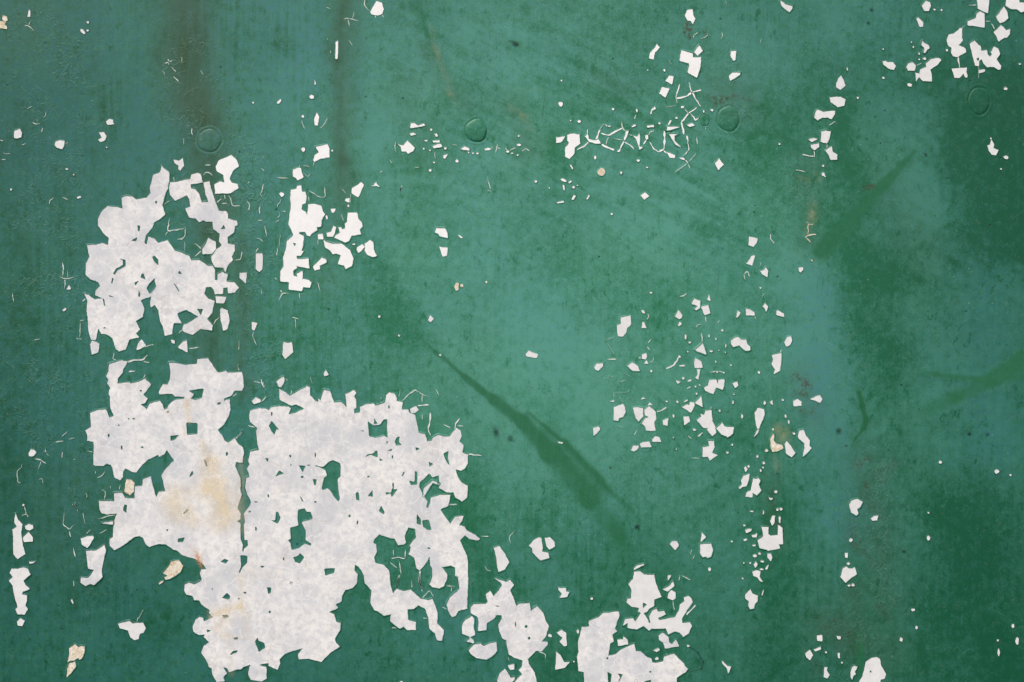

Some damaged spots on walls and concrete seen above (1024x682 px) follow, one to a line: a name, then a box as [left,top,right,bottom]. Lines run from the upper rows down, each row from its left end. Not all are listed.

peeling [646,43,661,71]
peeling [658,44,704,99]
peeling [728,49,742,82]
peeling [881,0,1024,87]
peeling [278,122,492,300]
peeling [79,154,696,682]
peeling [609,293,823,461]
peeling [8,503,36,627]